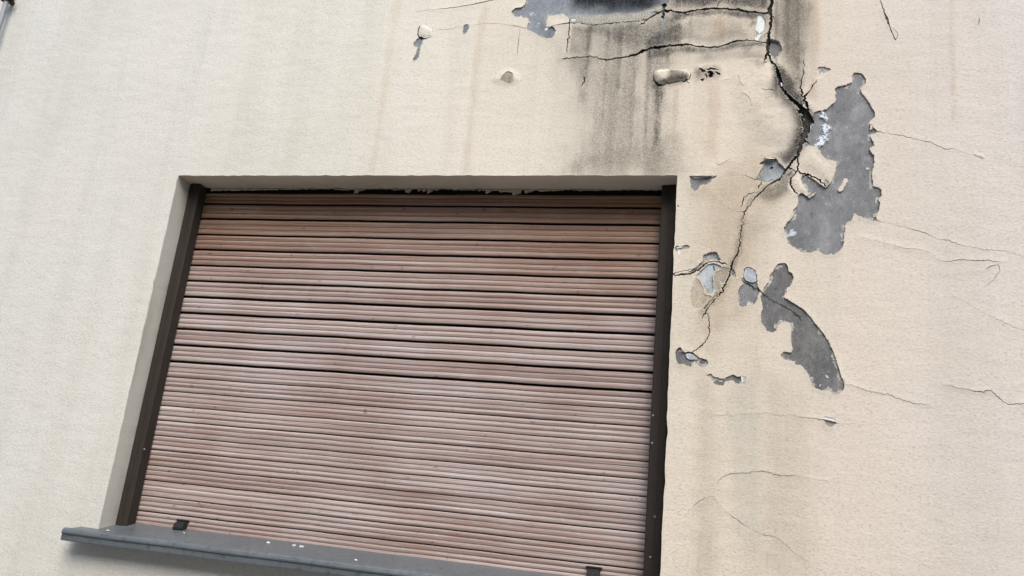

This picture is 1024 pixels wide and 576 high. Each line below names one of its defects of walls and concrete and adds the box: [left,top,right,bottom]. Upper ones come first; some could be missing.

peeling [512,0,669,38]
leakage [568,0,767,57]
leakage [782,0,809,82]
crack [417,0,826,354]
peeling [689,175,716,191]
peeling [756,157,786,182]
peeling [784,72,882,255]
peeling [687,251,844,395]
peeling [675,347,747,386]
crack [953,386,1024,405]